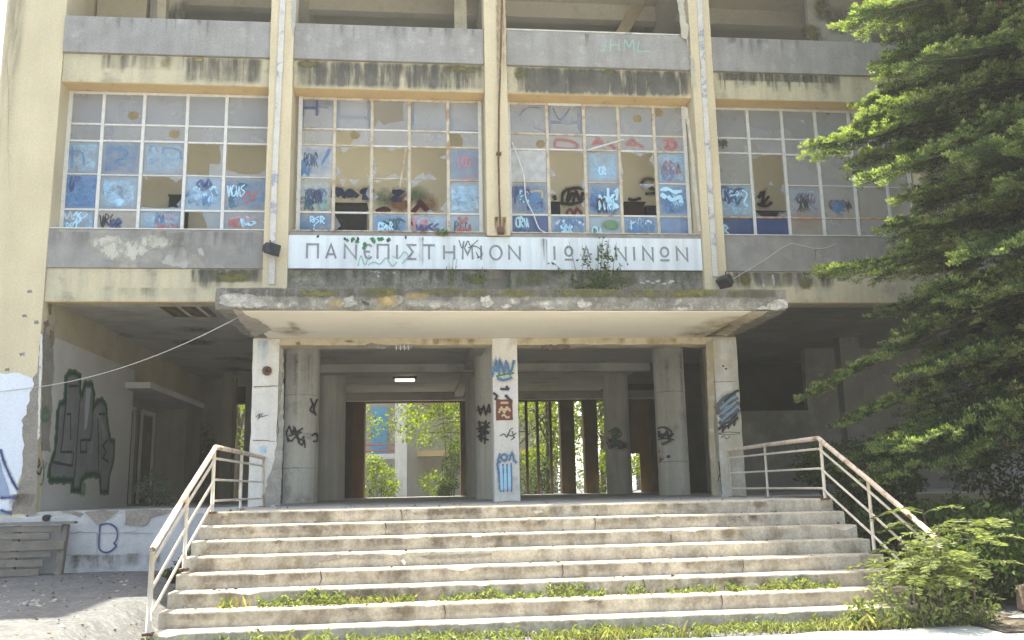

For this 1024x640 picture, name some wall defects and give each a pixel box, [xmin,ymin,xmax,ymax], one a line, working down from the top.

leakage [299,61,480,89]
leakage [516,68,687,96]
leakage [719,73,838,86]
peeling [92,234,204,269]
spalling [344,296,370,307]
spalling [480,295,513,309]
spalling [10,304,55,515]